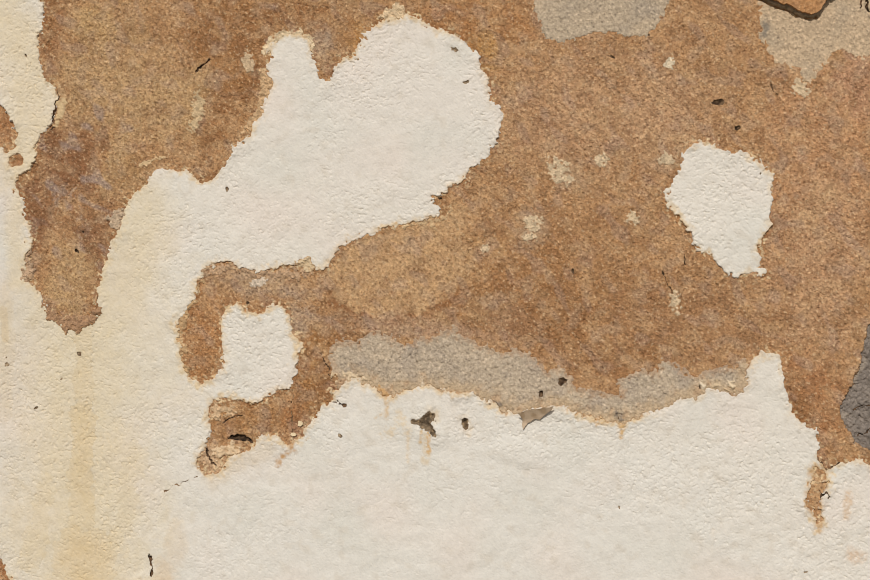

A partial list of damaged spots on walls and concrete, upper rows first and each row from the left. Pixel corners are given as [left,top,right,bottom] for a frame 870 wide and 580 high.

spalling [533,0,670,43]
spalling [757,0,870,84]
peeling [238,67,273,137]
peeling [0,105,23,167]
peeling [400,204,454,230]
peeling [197,262,313,282]
peeling [41,300,102,335]
peeling [176,299,199,356]
peeling [209,400,238,422]
spalling [327,324,749,429]
spalling [840,324,870,450]
peeling [210,440,242,459]